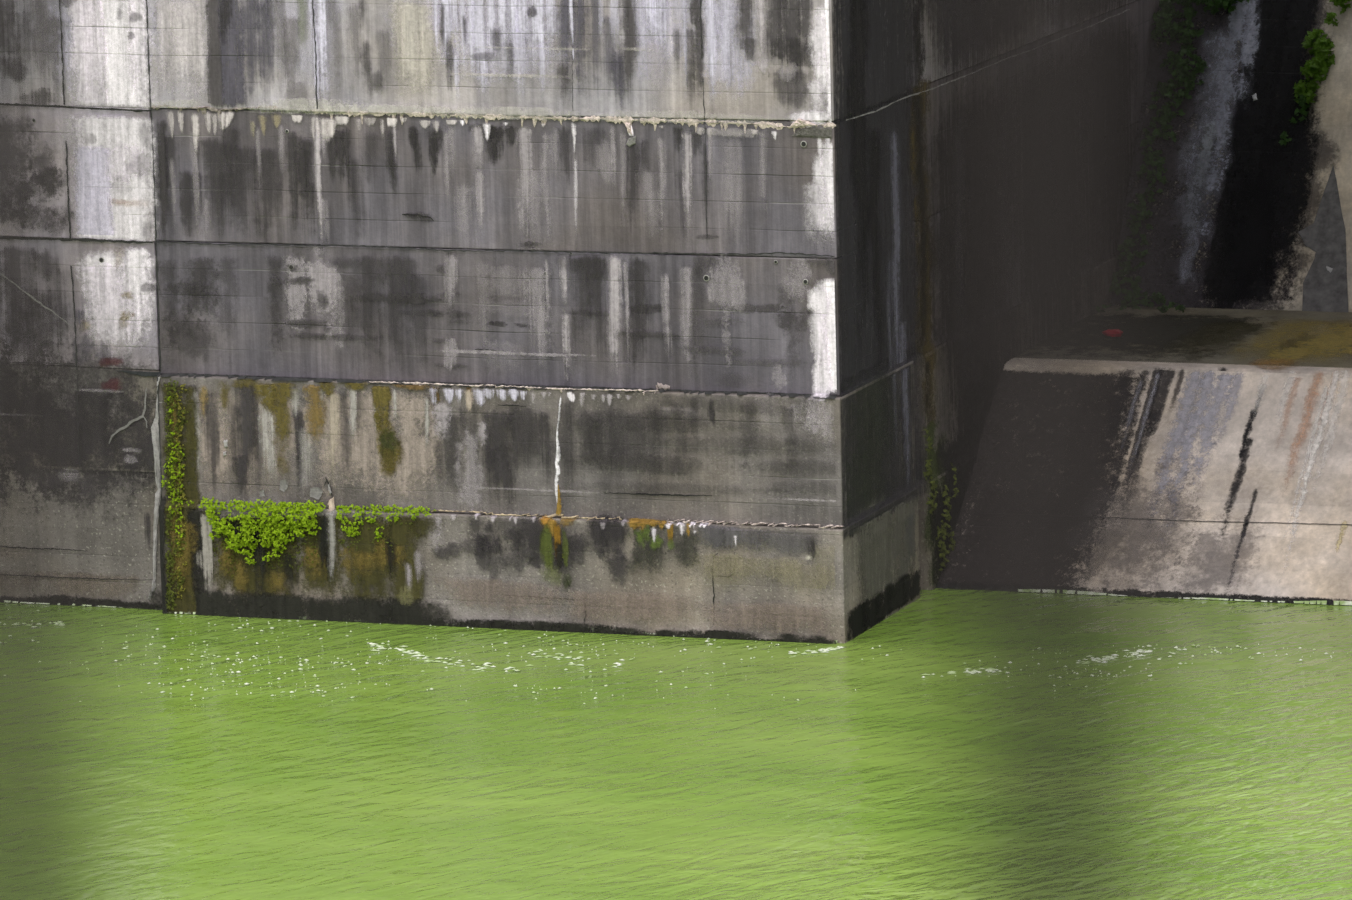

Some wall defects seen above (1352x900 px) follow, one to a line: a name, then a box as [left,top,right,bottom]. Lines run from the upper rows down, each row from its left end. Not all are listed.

leakage [52,0,983,641]
leakage [1118,367,1352,606]